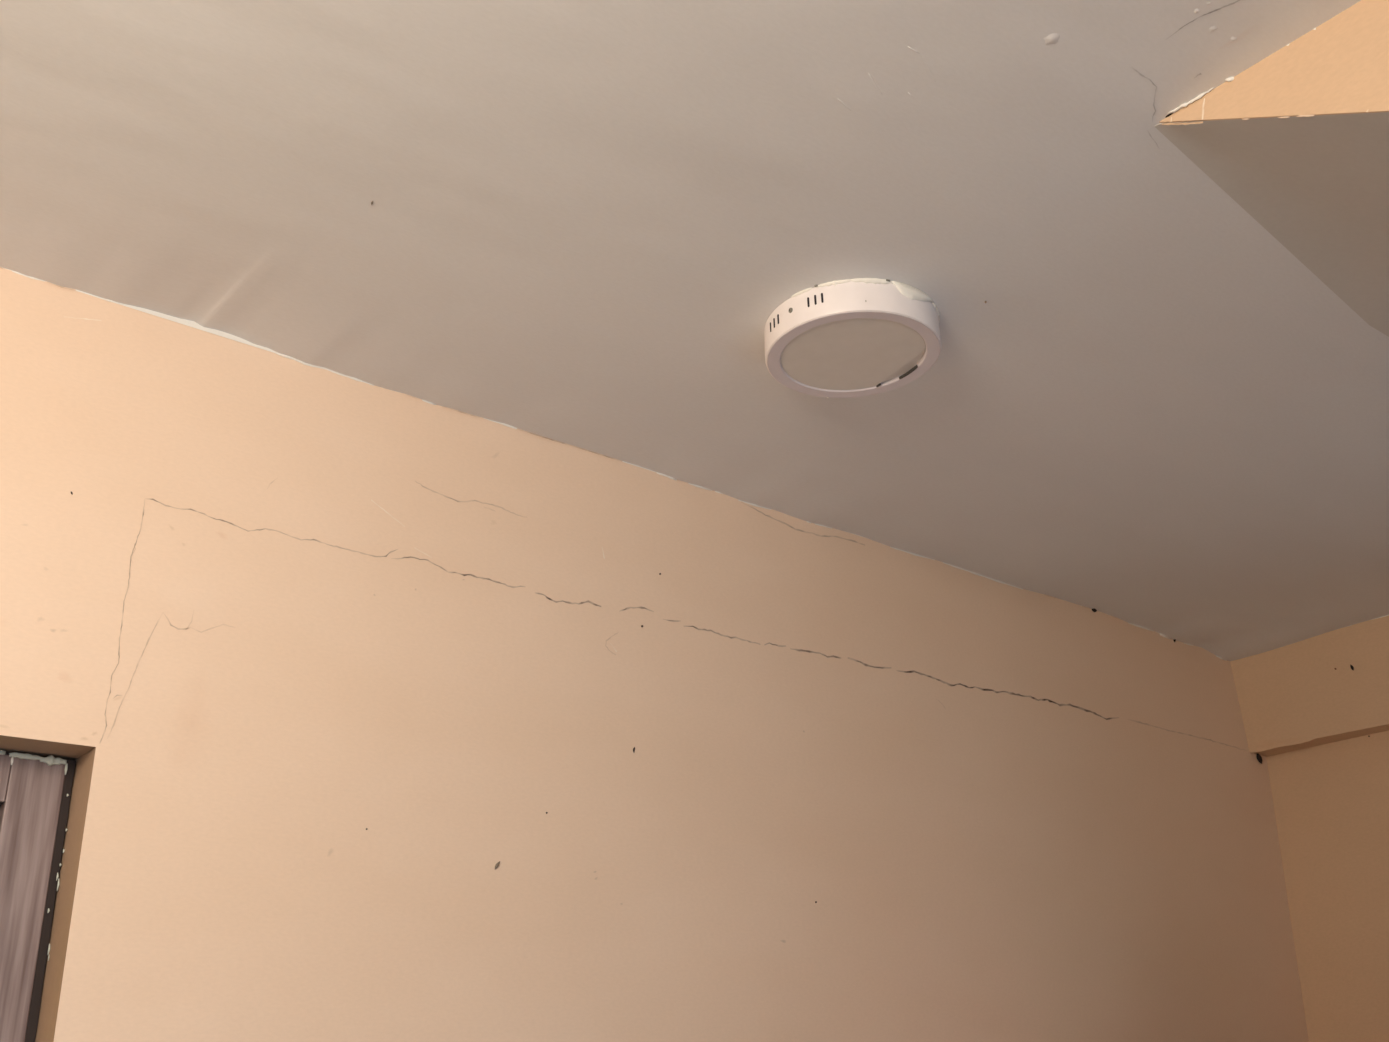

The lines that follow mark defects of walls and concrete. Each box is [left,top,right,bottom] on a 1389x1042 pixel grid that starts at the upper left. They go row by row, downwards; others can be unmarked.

crack [1165,0,1241,40]
crack [1131,67,1203,149]
crack [415,481,527,518]
crack [99,498,1247,751]